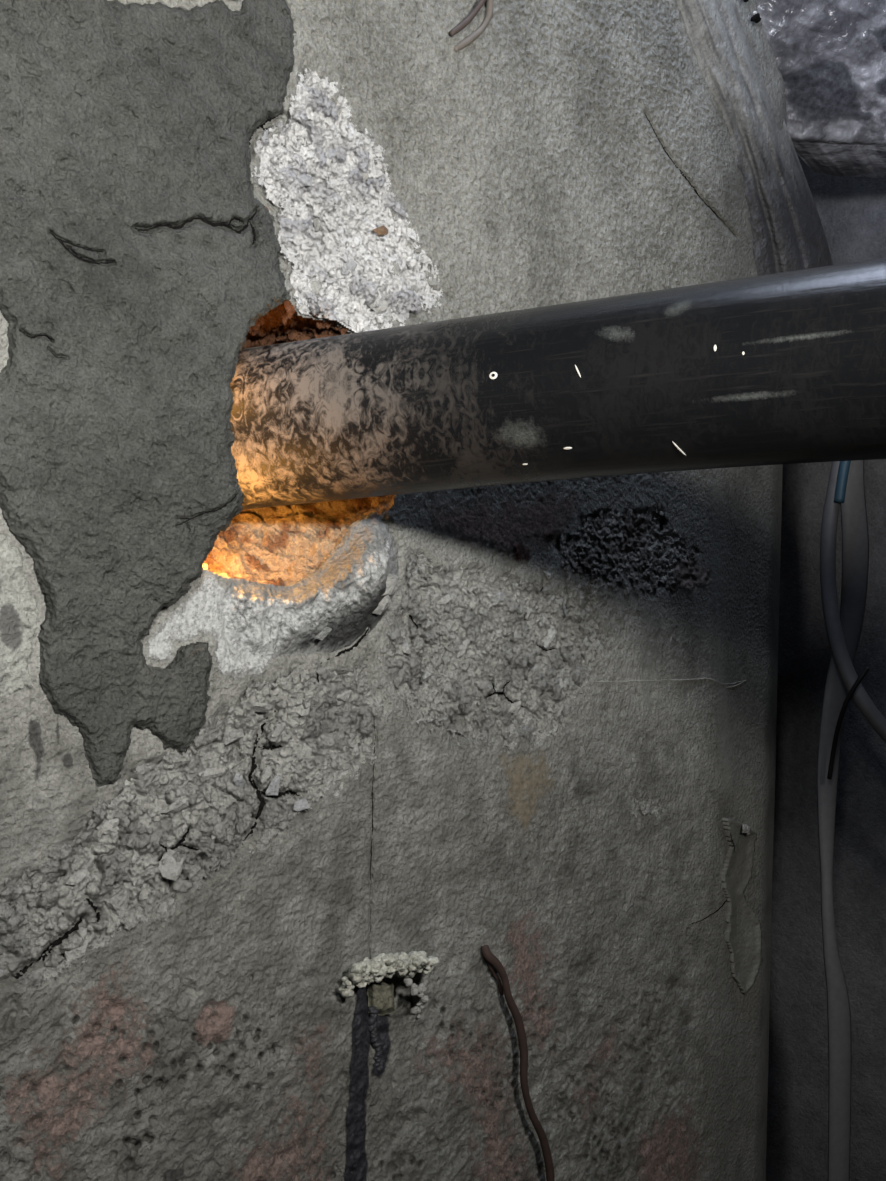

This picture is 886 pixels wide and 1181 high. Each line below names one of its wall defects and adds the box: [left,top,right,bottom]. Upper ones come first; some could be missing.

crack [49,232,112,264]
crack [135,209,257,245]
spalling [242,68,443,349]
spalling [203,495,396,587]
crack [316,615,418,682]
crack [486,681,524,707]
crack [242,710,300,845]
crack [159,828,199,861]
crack [368,722,376,959]
crack [13,898,101,979]
peeling [690,818,762,993]
damp [372,1015,390,1077]